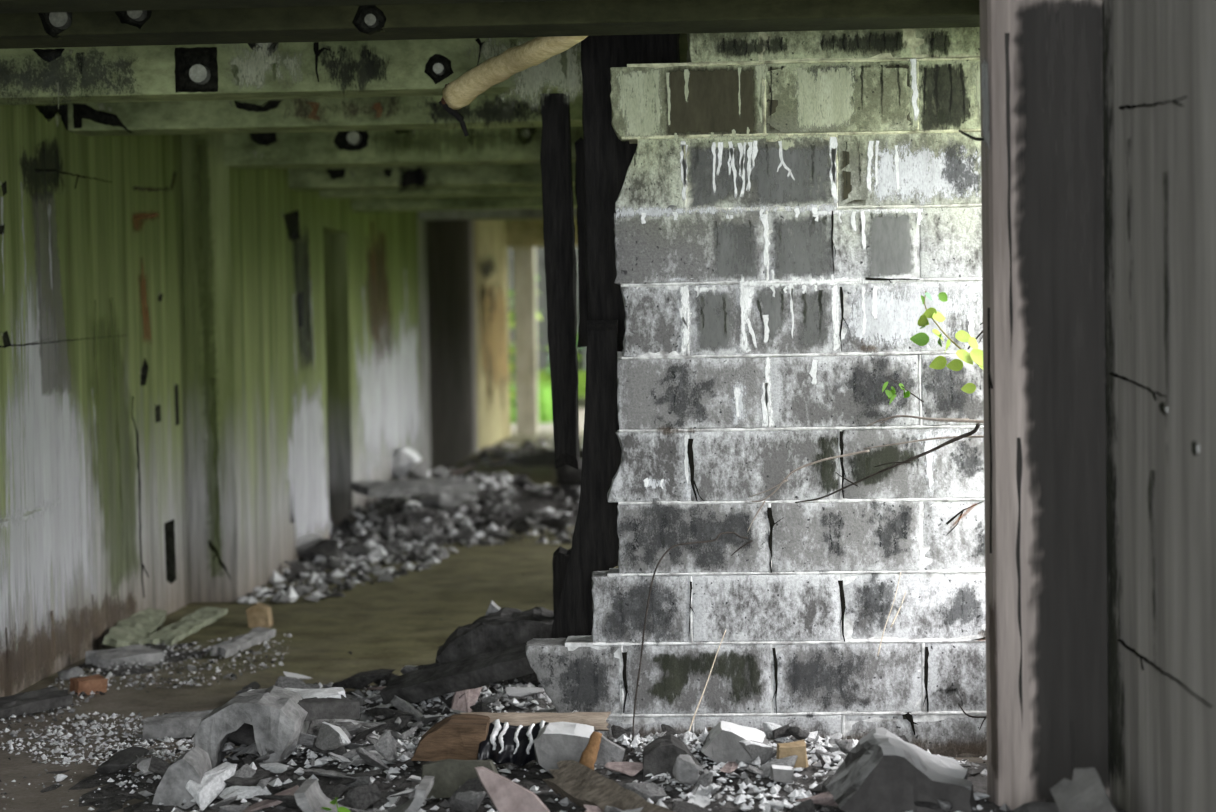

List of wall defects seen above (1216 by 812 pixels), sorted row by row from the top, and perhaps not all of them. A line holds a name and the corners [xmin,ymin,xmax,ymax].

crack [1119,96,1187,110]
leakage [0,139,137,696]
leakage [288,228,331,539]
leakage [356,269,422,477]
leakage [539,31,990,739]
leakage [1005,0,1125,802]
leakage [975,522,994,557]
leakage [911,586,998,778]
crack [1118,639,1212,707]